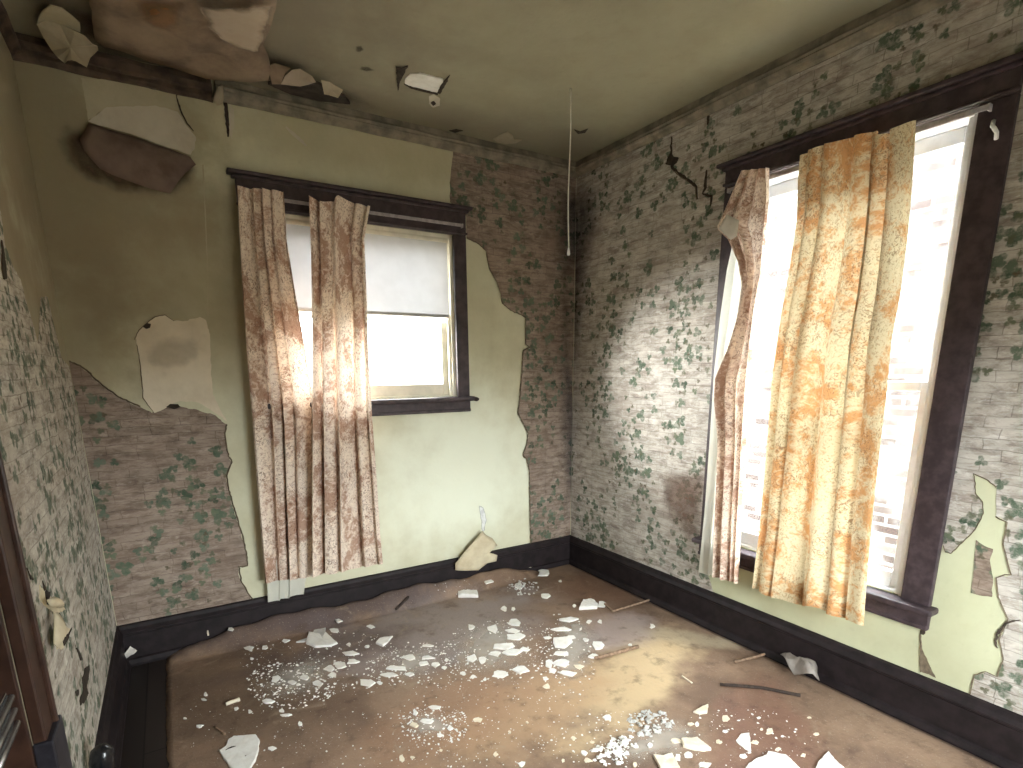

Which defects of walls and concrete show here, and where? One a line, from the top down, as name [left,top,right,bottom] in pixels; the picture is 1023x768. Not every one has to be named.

flaking render [37,5,196,155]
flaking render [396,66,450,107]
crack [666,137,713,206]
flaking render [134,315,227,421]
peeling [47,596,68,648]